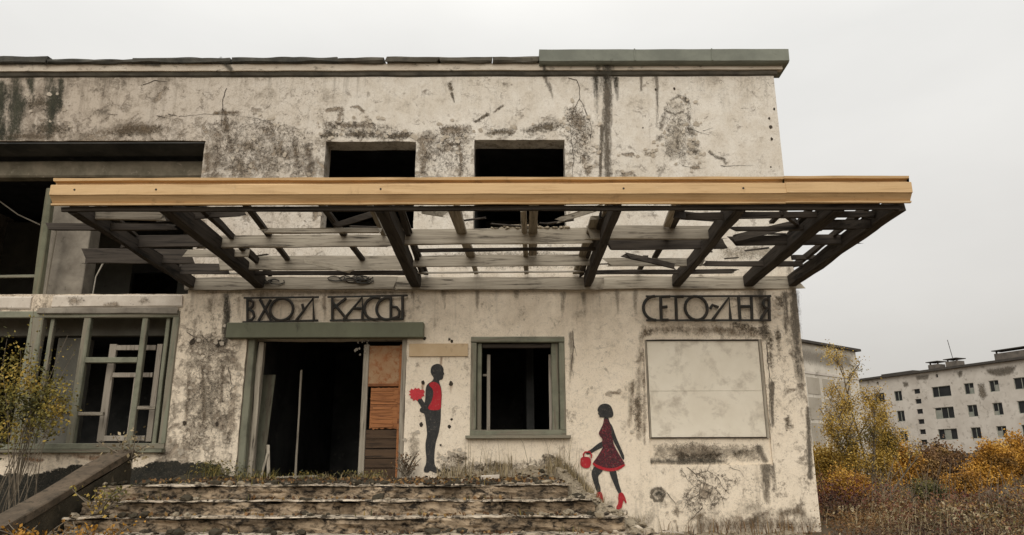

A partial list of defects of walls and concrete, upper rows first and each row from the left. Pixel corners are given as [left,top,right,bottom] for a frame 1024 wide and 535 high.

damp [0,63,64,140]
damp [97,123,161,136]
crack [570,78,592,173]
damp [593,65,618,177]
peeling [617,87,726,172]
damp [222,294,230,345]
damp [782,290,804,385]